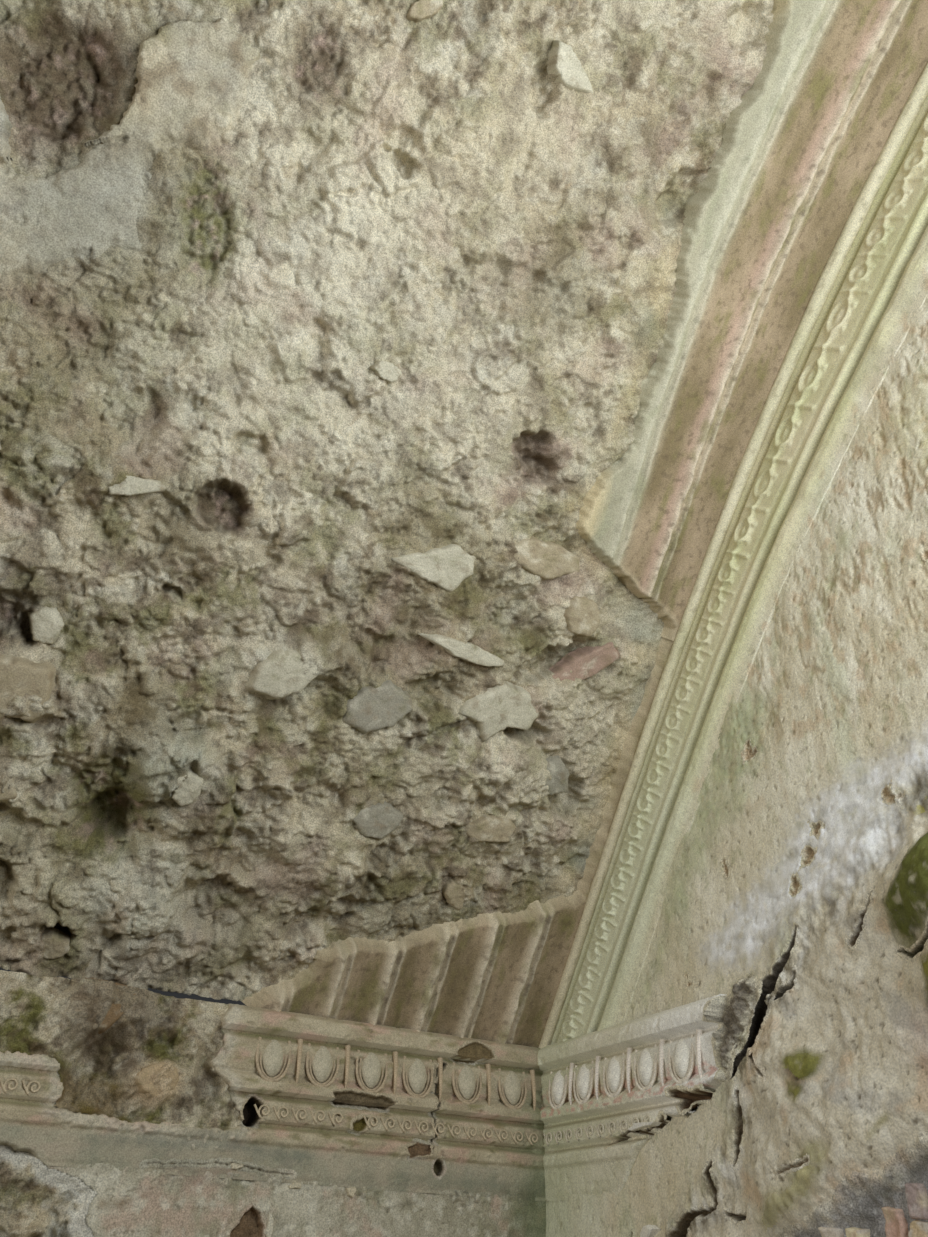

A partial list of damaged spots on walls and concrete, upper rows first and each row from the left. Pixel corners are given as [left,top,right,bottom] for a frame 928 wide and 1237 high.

spalling [0,0,135,163]
spalling [279,2,357,118]
spalling [169,156,246,299]
spalling [0,590,56,656]
spalling [60,749,168,865]
water stain [704,731,928,969]
spalling [0,970,243,1130]
spalling [226,1202,274,1237]
crack [603,1110,670,1150]
crack [627,921,800,1237]
spalling [702,970,763,1083]
crack [770,1153,810,1180]